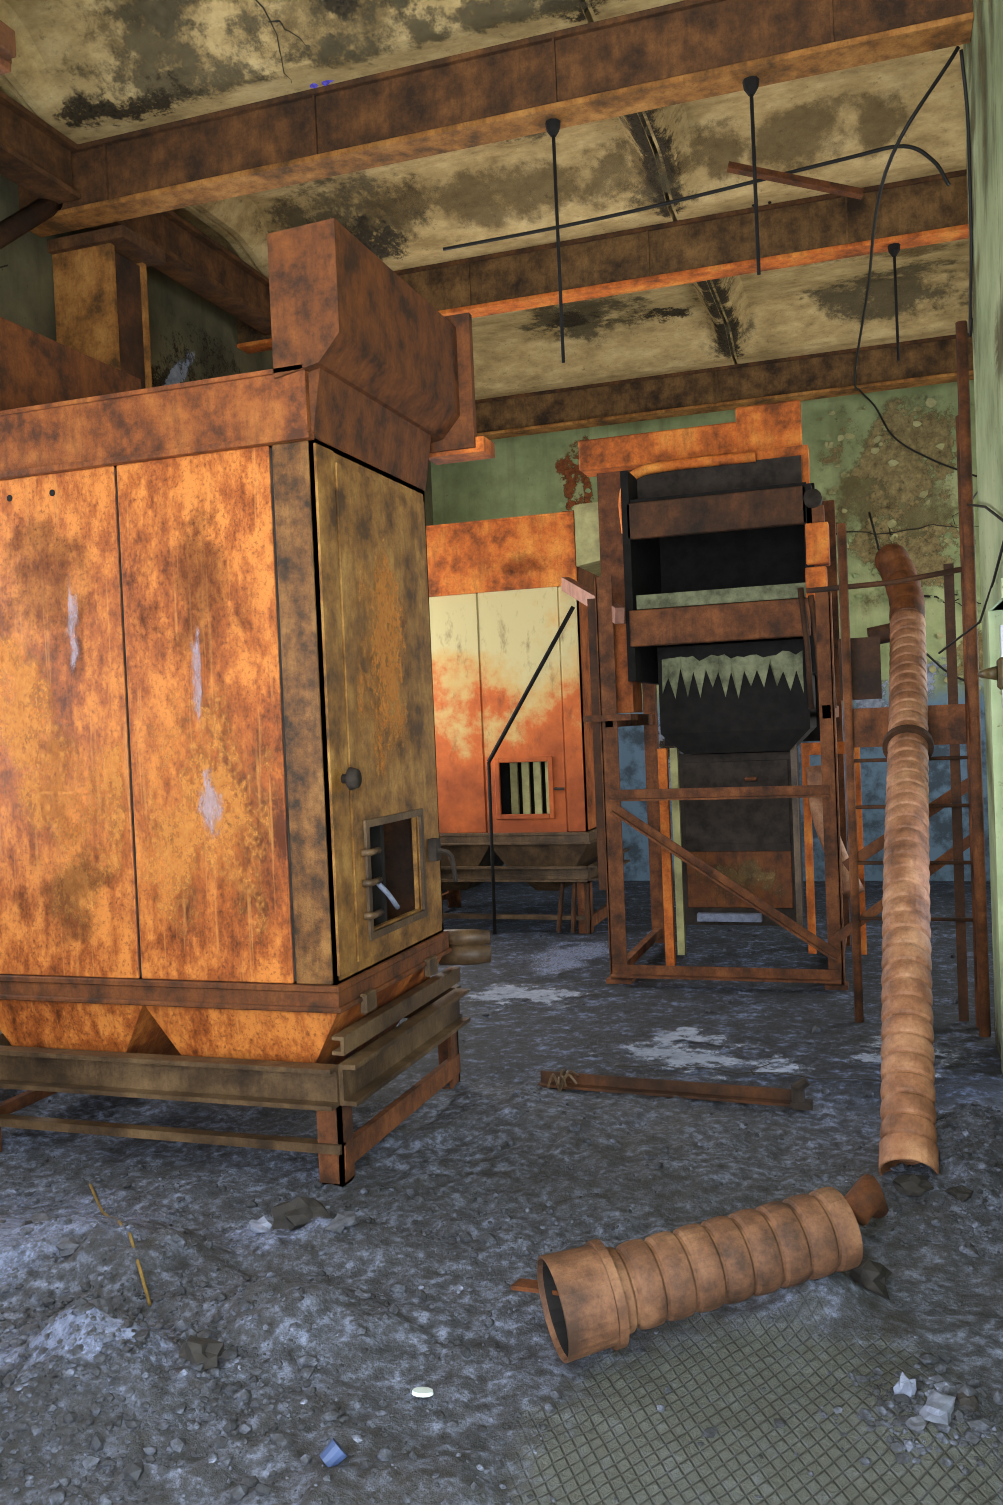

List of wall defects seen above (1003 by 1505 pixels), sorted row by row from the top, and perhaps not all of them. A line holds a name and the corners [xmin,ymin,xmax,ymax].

leakage [54,0,605,128]
leakage [964,0,994,218]
leakage [259,94,908,259]
leakage [519,276,753,359]
leakage [800,243,979,338]
peeling [817,398,961,604]
peeling [854,681,889,708]
peeling [926,629,983,697]